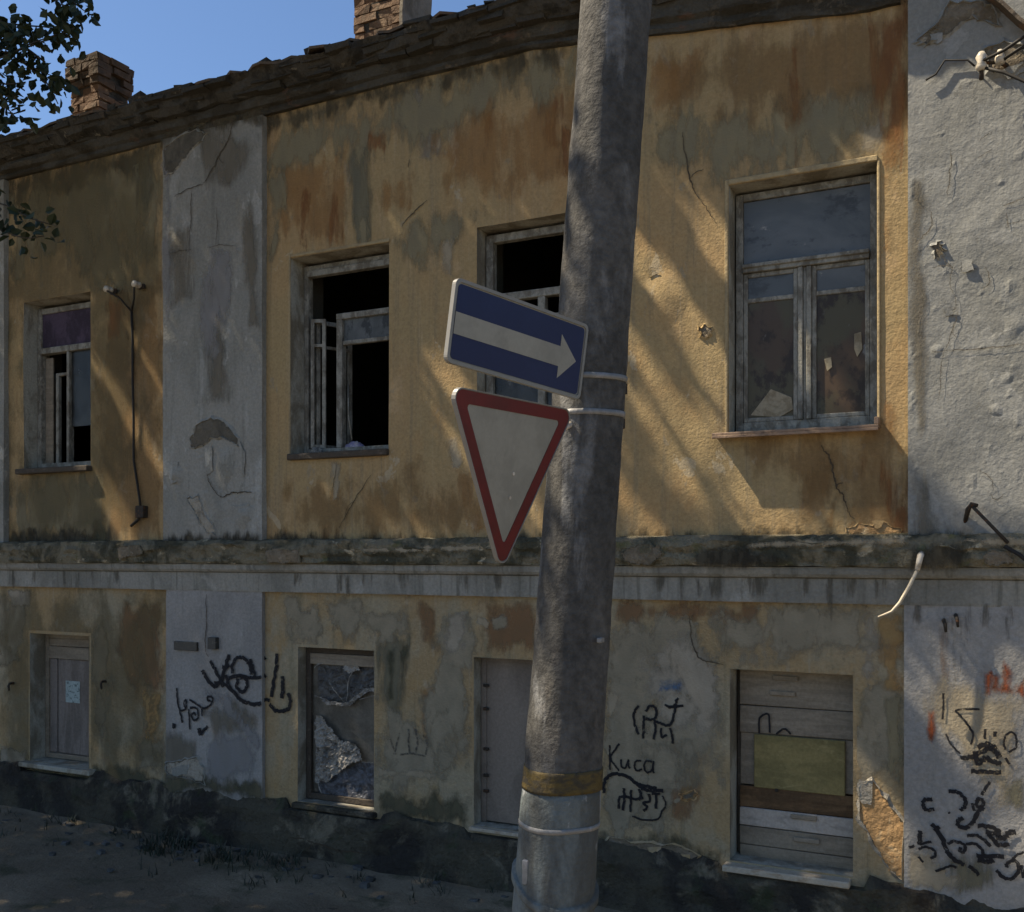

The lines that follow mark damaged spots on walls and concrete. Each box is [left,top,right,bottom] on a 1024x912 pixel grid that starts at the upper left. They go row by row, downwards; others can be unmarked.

flaking render [911,0,1024,80]
crack [168,121,233,255]
water stain [9,45,577,325]
crack [682,132,712,217]
water stain [657,85,882,190]
peeling [189,415,245,475]
crack [821,445,855,519]
water stain [935,678,1023,807]
water stain [380,792,465,823]
flaking render [855,776,904,882]
water stain [910,853,992,892]